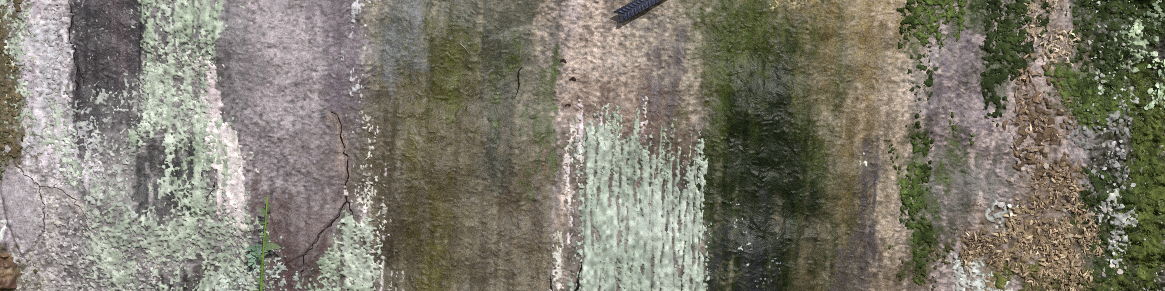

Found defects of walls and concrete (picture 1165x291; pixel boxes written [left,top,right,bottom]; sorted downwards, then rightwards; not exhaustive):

crack [301,111,354,275]
water stain [628,0,931,291]
crack [550,261,582,291]